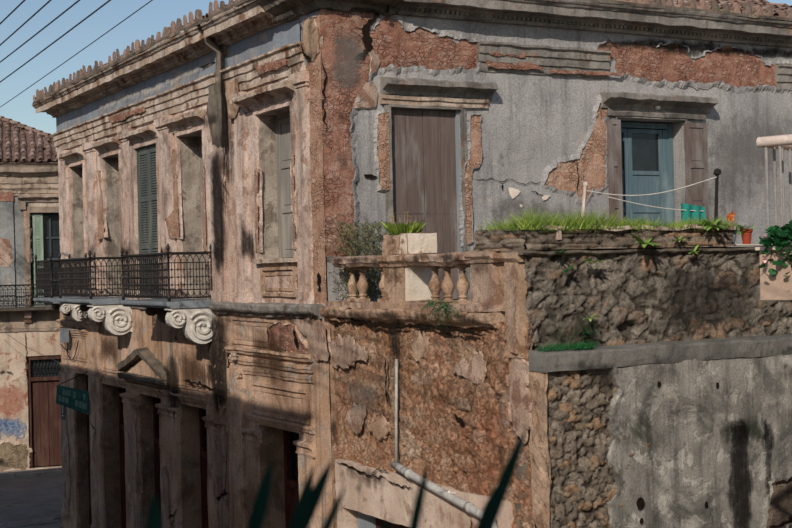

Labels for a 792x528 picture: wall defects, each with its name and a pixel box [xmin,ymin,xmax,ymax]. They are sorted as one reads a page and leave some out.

crack [299,20,327,132]
flaking render [593,35,792,95]
flaking render [256,0,483,308]
flaking render [540,95,611,208]
crack [474,178,544,196]
flaking render [267,317,368,370]
flaking render [0,440,33,471]
crack [337,462,411,489]
damp [721,419,774,528]
flaking render [760,473,792,528]